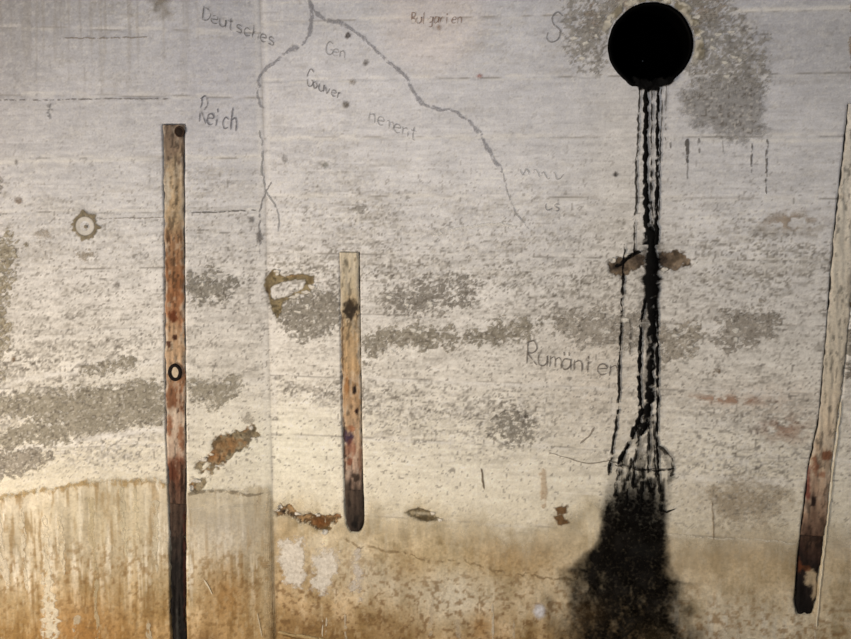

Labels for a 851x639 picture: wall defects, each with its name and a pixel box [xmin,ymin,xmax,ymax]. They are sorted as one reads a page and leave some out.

peeling [264,269,341,344]
spalling [608,250,645,276]
leakage [607,88,674,511]
spalling [659,249,691,272]
spalling [189,425,260,493]
spalling [275,504,341,535]
leakage [0,478,173,639]
leakage [185,490,602,639]
leakage [665,535,851,639]